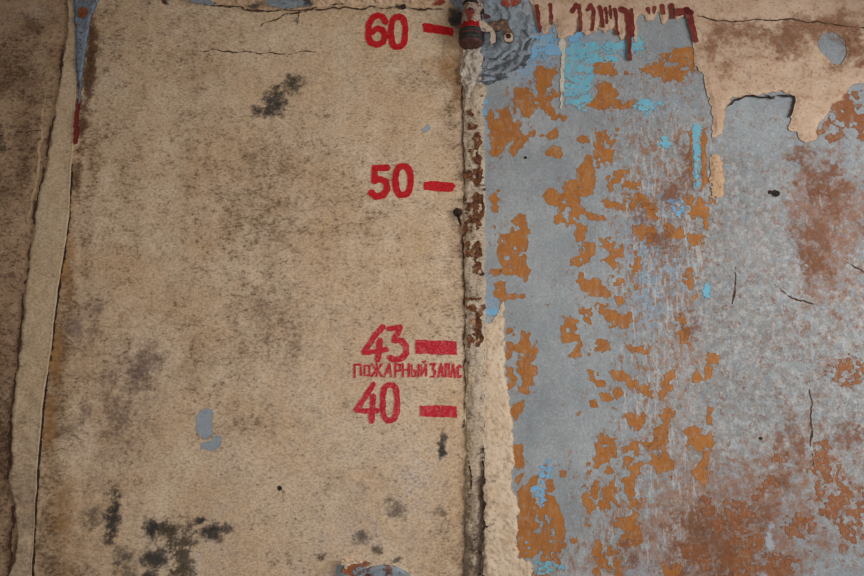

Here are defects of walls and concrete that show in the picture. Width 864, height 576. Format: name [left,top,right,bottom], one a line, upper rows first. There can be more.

crack [192,48,312,56]
crack [212,3,442,27]
leakage [253,74,305,116]
corrosion [663,142,696,206]
corrosion [787,146,852,220]
crack [0,50,64,482]
peeling [460,0,864,576]
corrosion [790,218,837,280]
crack [7,164,73,576]
leakage [88,485,232,576]